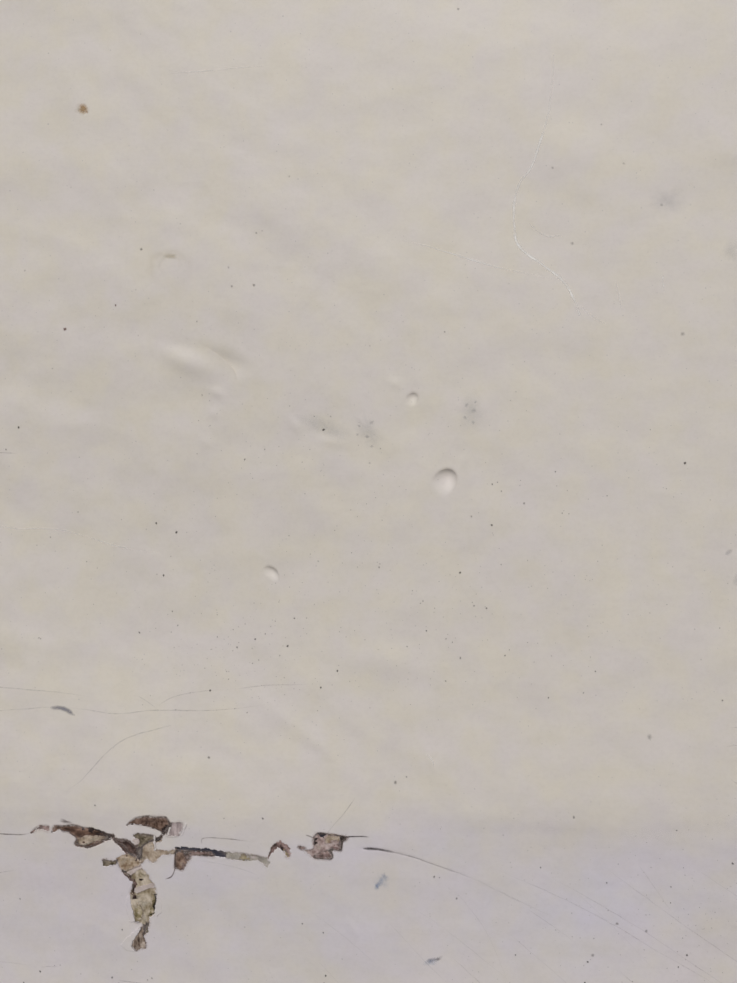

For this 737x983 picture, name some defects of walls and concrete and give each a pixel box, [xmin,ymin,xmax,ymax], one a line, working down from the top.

peeling [31,816,347,952]